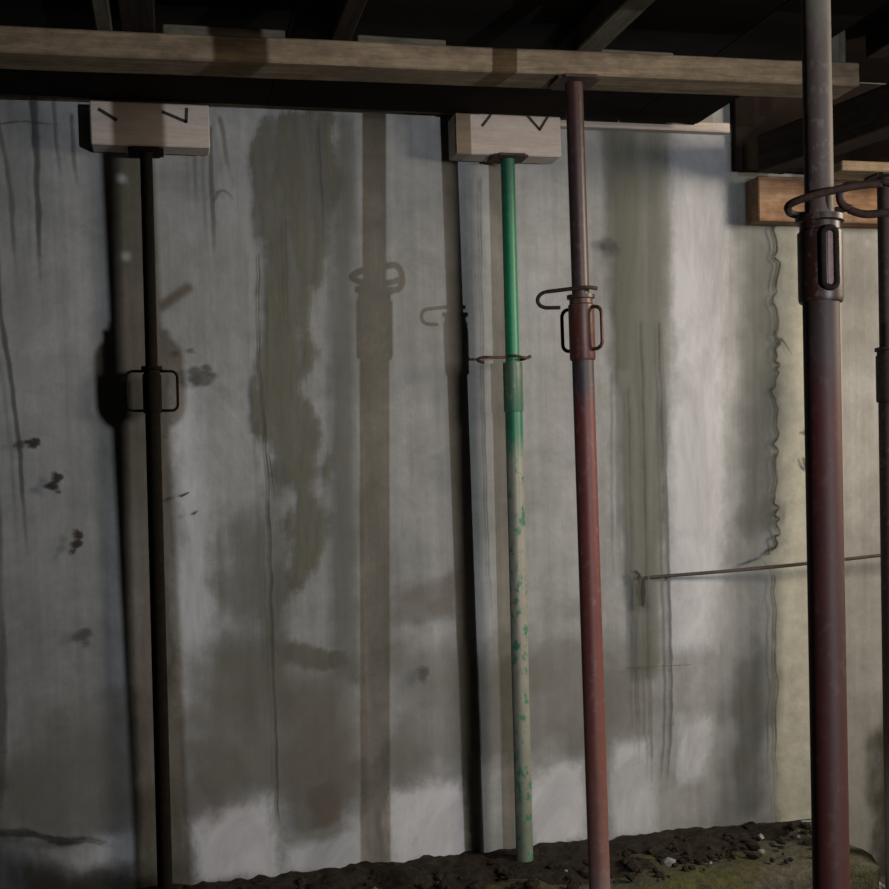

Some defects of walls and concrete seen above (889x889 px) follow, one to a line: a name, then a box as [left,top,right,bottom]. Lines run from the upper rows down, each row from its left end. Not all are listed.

spalling [16,438,40,448]
spalling [46,472,64,493]
spalling [71,530,84,554]
water stain [169,371,229,734]
spalling [190,365,217,386]
water stain [607,130,731,781]
crack [744,225,790,564]
crack [772,577,780,751]
efflorescence [193,798,366,882]
water stain [381,739,472,863]
efflorescence [532,763,585,844]
water stain [611,707,655,836]